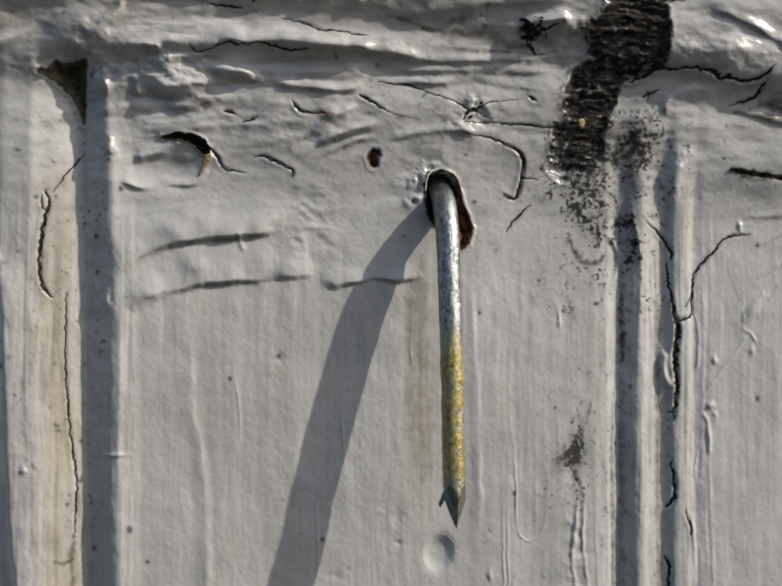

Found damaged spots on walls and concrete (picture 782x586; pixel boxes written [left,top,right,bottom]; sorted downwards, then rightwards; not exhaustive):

crack [207,0,254,9]
peeling [519,16,559,55]
peeling [549,0,674,179]
peeling [160,131,213,176]
crack [359,81,552,232]
peeling [728,167,782,181]
rust [452,180,474,251]
crack [37,154,85,532]
crack [648,223,751,422]
crack [665,459,692,535]
crack [663,556,671,586]